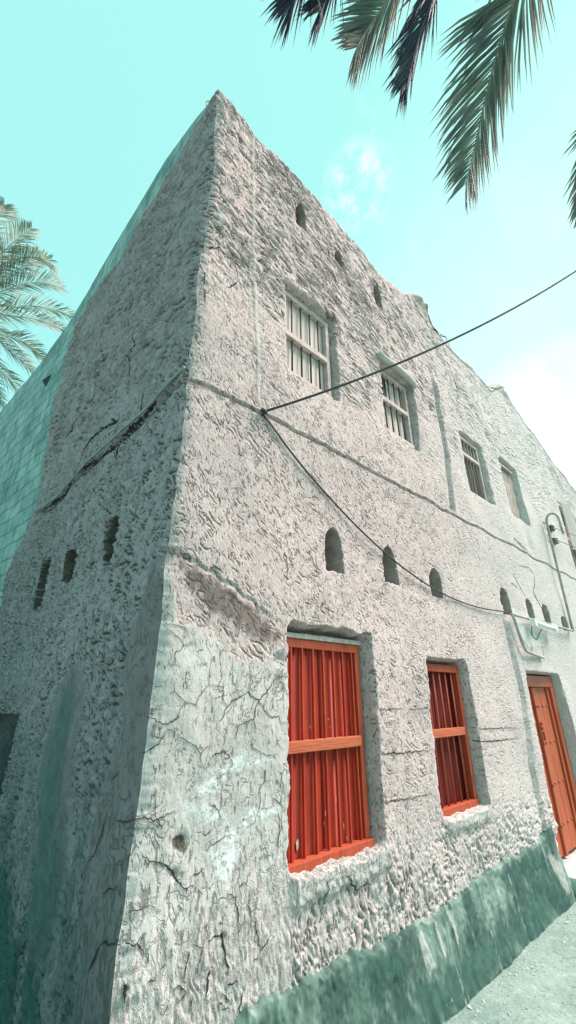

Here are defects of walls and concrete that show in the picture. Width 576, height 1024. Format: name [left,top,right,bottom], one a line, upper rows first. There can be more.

crack [41,336,156,512]
crack [86,619,289,1016]
crack [472,727,518,742]